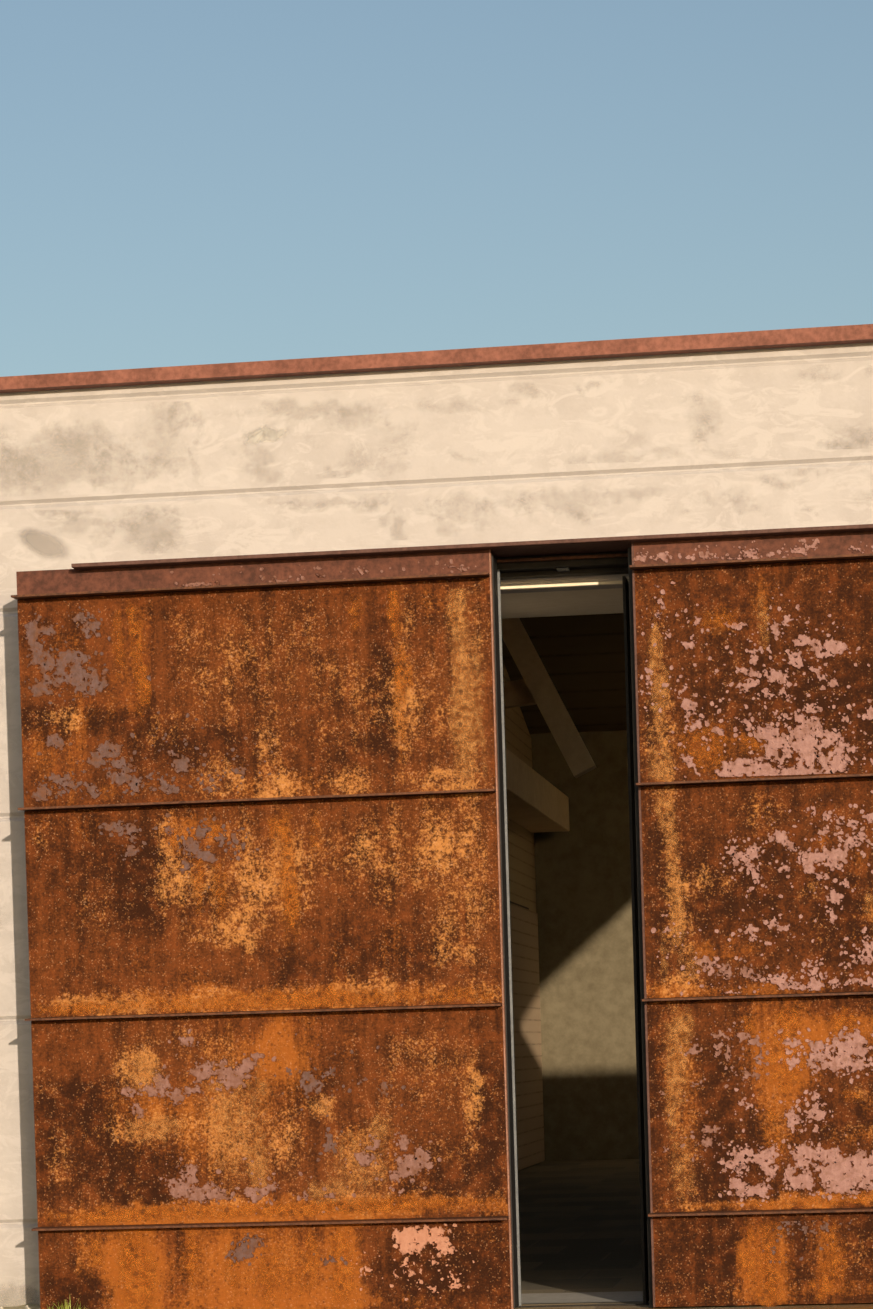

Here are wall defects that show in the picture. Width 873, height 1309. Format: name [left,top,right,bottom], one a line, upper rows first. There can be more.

peeling [23,606,111,704]
rust [448,591,480,758]
rust [650,626,667,719]
peeling [638,581,873,778]
peeling [26,710,280,801]
peeling [651,790,873,996]
peeling [121,1025,423,1119]
rust [667,1013,692,1126]
peeling [654,1013,873,1207]
rust [770,1009,801,1081]
peeling [160,1115,442,1214]
peeling [313,1223,475,1301]